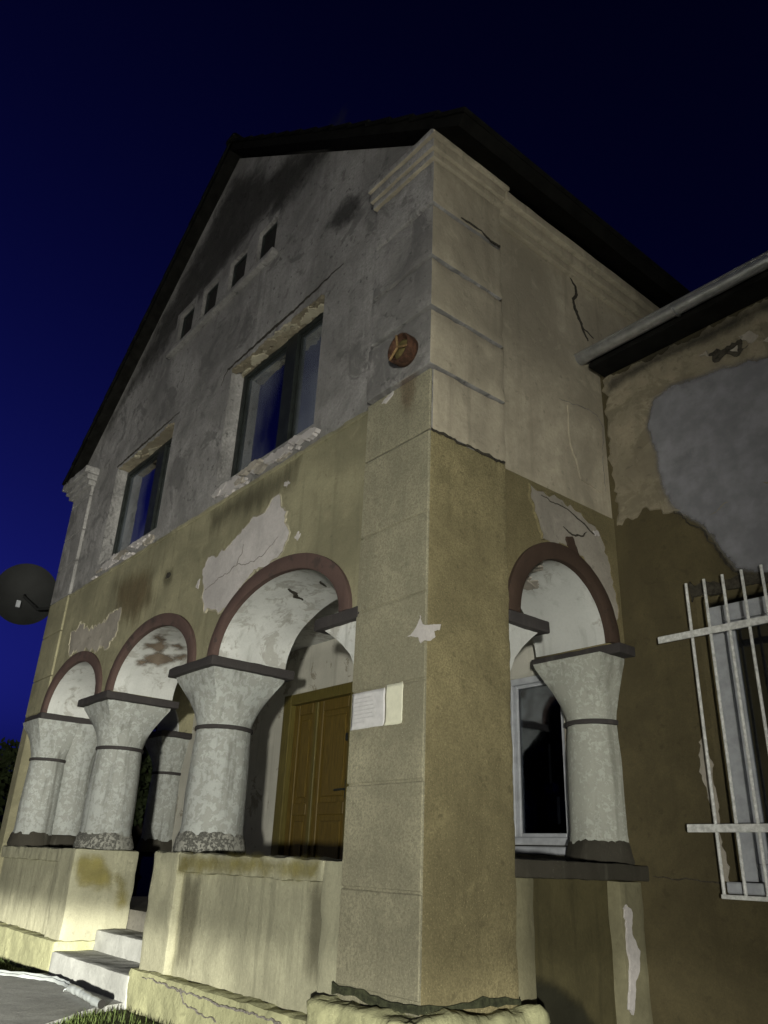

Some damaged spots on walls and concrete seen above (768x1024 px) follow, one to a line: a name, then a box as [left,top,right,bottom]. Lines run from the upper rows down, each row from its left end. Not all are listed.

water stain [331,197,358,227]
crack [461,217,500,248]
crack [570,278,594,341]
flaking render [602,299,768,526]
flaking render [196,481,301,614]
flaking render [528,483,620,626]
flaking render [68,607,122,657]
flaking render [407,615,441,643]
peeling [699,736,730,882]
flaking render [623,904,640,1015]
crack [141,977,282,1024]
flaking render [331,981,521,1016]